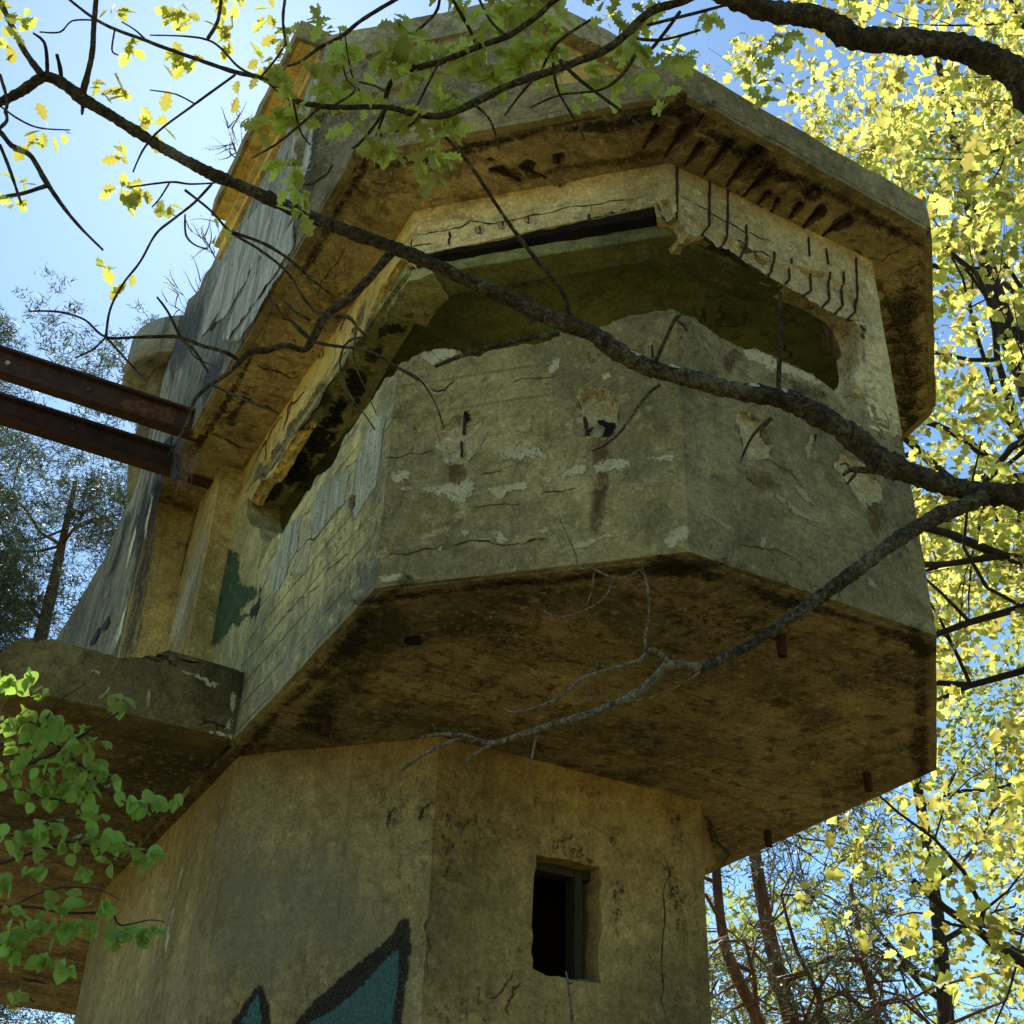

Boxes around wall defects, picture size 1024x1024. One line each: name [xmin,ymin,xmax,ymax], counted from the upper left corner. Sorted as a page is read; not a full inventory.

spalling [642,113,867,385]
peeling [211,404,630,647]
crack [377,538,546,560]
spalling [565,372,619,439]
rust [590,438,608,531]
spalling [834,453,882,512]
water stain [876,261,927,447]
spalling [183,670,220,688]
water stain [239,554,950,785]
crack [661,849,671,1015]